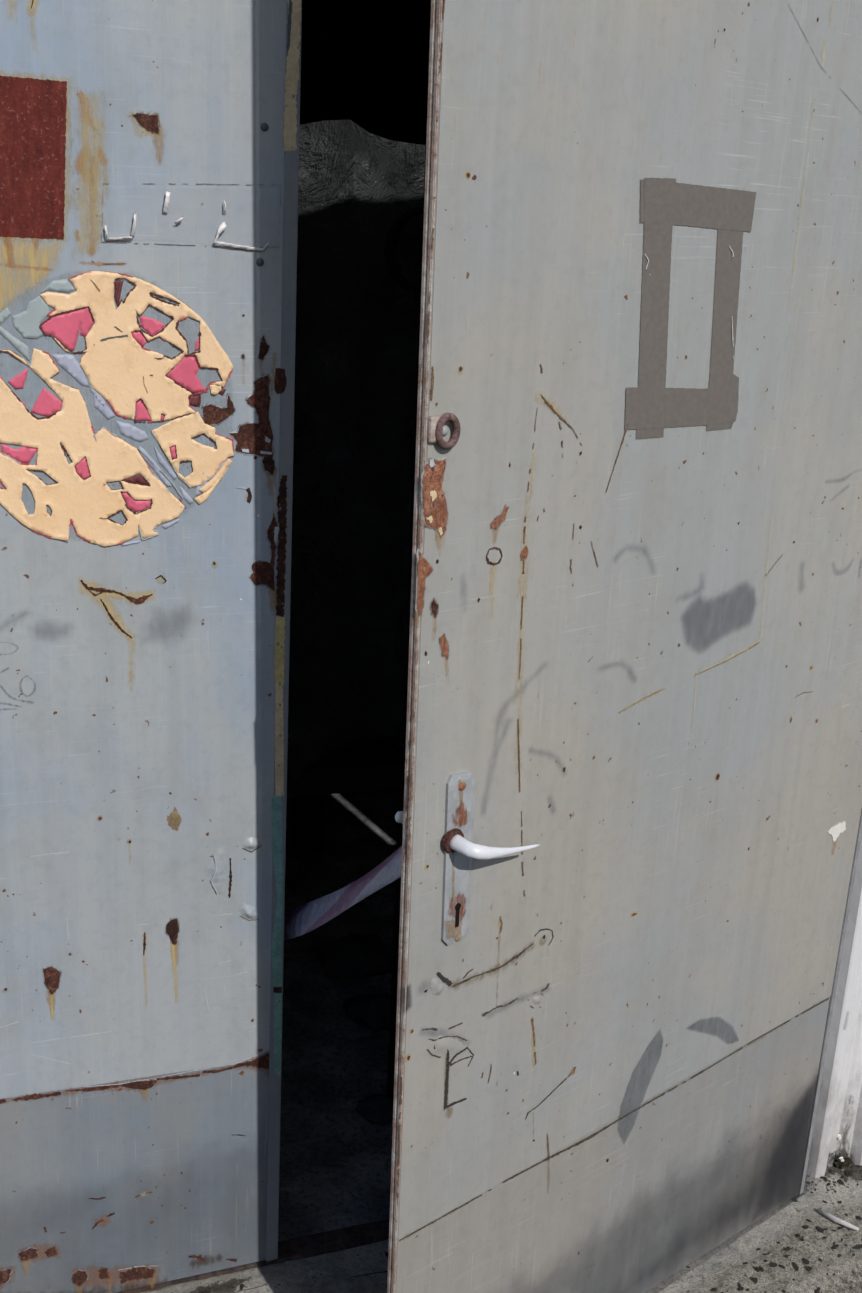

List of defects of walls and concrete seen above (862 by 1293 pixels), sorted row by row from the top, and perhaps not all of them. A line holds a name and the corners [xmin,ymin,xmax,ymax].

rust [131,111,161,135]
peeling [0,271,234,546]
rust [201,334,288,617]
rust [421,457,448,539]
rust [80,575,167,638]
rust [415,549,439,618]
rust [425,632,450,664]
rust [165,917,180,988]
rust [42,965,62,1019]
rust [0,1227,66,1286]
rust [70,1265,158,1293]